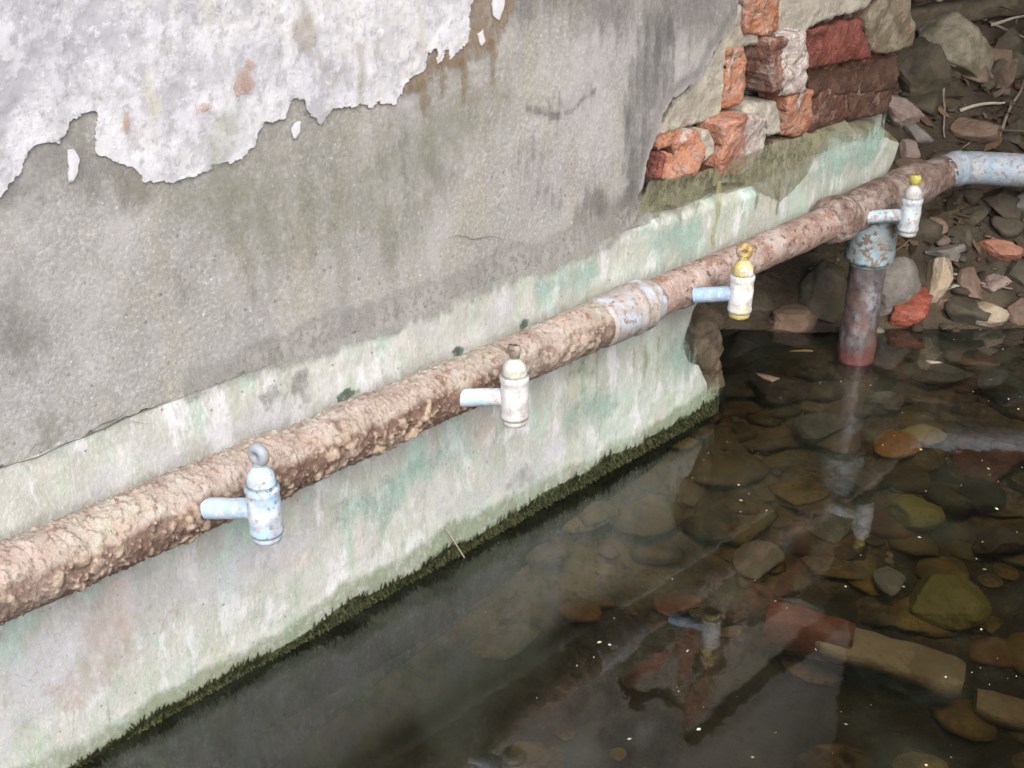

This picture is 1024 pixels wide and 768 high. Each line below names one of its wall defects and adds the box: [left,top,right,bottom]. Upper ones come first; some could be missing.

peeling [0,0,485,197]
peeling [491,0,505,20]
water stain [620,0,826,223]
flaking render [645,0,916,181]